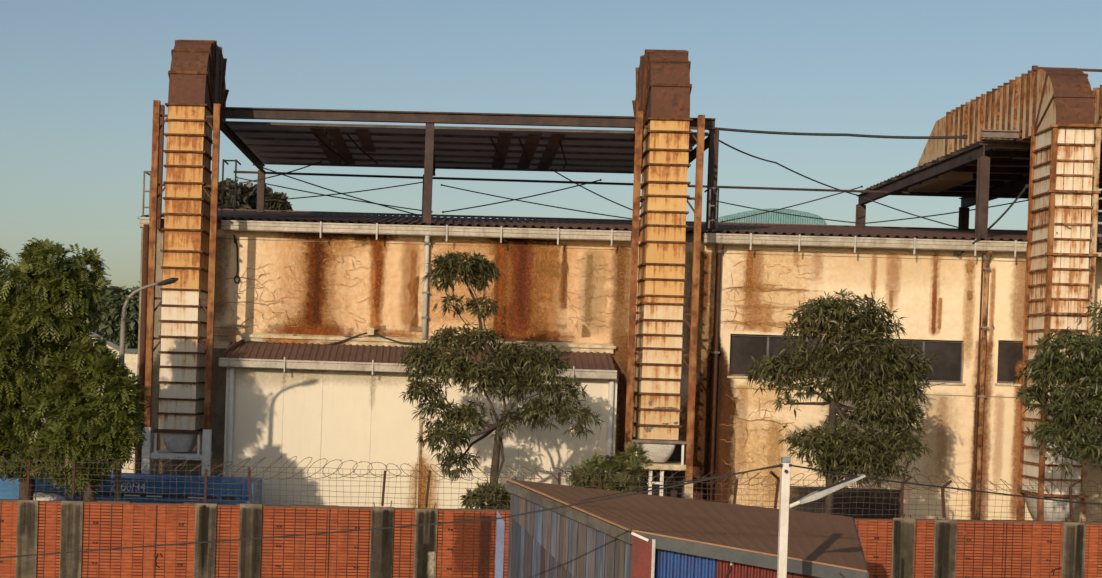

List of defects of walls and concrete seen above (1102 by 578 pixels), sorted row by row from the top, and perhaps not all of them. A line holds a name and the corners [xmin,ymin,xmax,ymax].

crack [214,245,370,330]
rust [263,232,353,345]
rust [369,234,416,337]
rust [490,238,567,342]
rust [745,251,771,332]
rust [932,254,942,334]